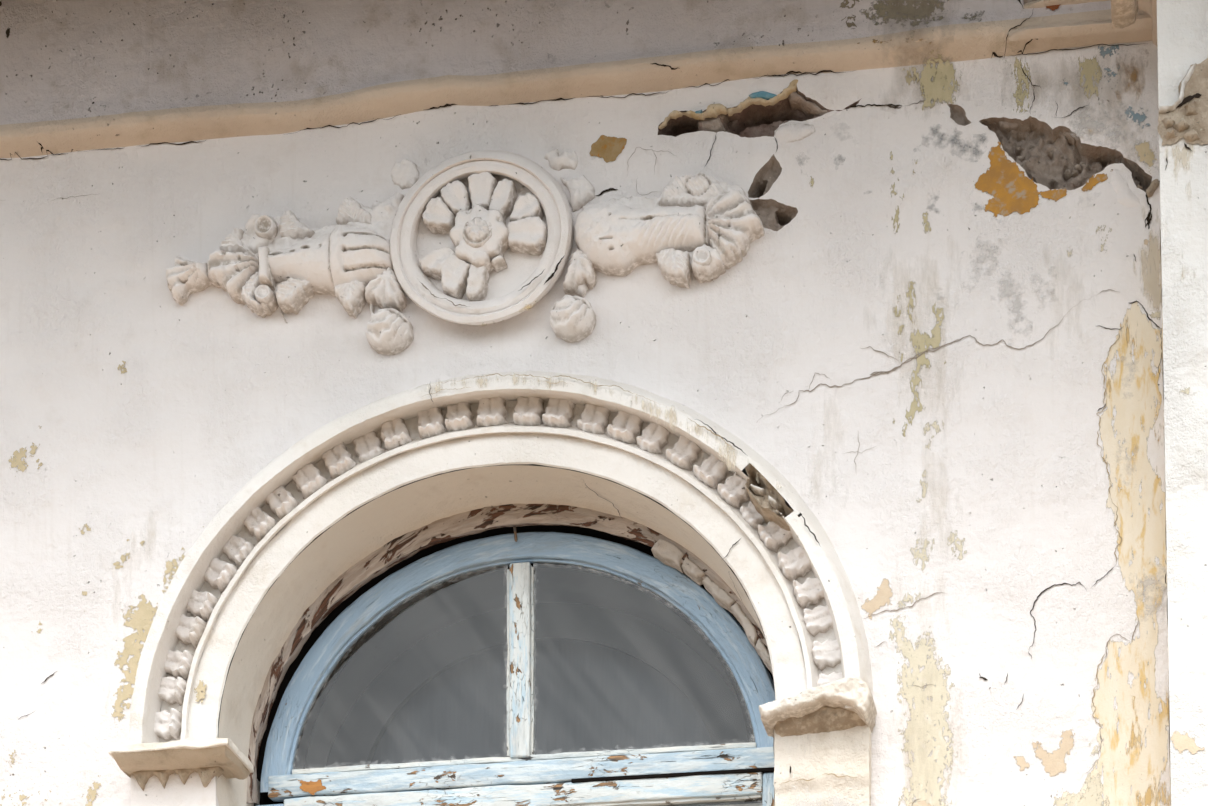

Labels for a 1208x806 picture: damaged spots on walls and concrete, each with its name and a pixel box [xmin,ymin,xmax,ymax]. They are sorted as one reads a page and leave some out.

crack [0,140,206,160]
spalling [658,79,861,138]
spalling [748,154,798,231]
damp [840,0,944,29]
damp [902,50,961,110]
spalling [947,104,1159,217]
crack [991,0,1145,118]
crack [757,289,1162,422]
crack [422,373,744,453]
peeling [1054,300,1170,806]
peeling [111,547,185,722]
crack [979,567,1114,709]